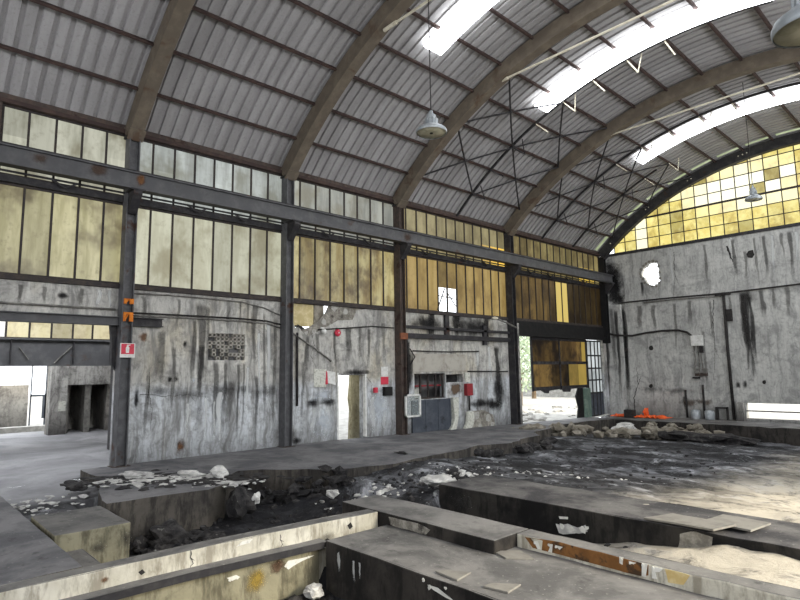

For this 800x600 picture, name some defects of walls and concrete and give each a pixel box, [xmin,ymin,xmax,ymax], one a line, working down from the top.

spalling [639,260,662,287]
water stain [606,308,630,381]
water stain [741,294,756,360]
peeling [525,516,690,585]